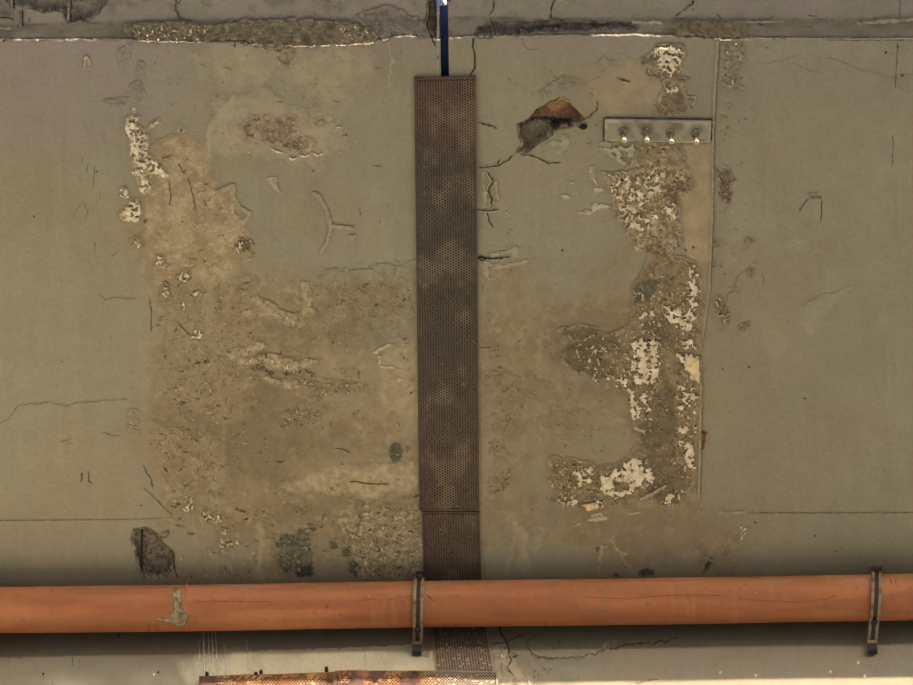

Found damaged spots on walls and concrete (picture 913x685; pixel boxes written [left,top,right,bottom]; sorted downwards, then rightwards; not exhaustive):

spalling [0,0,108,28]
spalling [515,97,584,154]
peeling [118,106,255,315]
crack [477,153,557,228]
peeling [578,143,678,234]
crack [478,254,509,262]
damp [108,39,419,585]
peeling [639,267,700,414]
peeling [606,337,661,420]
peeling [567,457,655,508]
spalling [131,528,175,580]
crack [493,622,675,674]